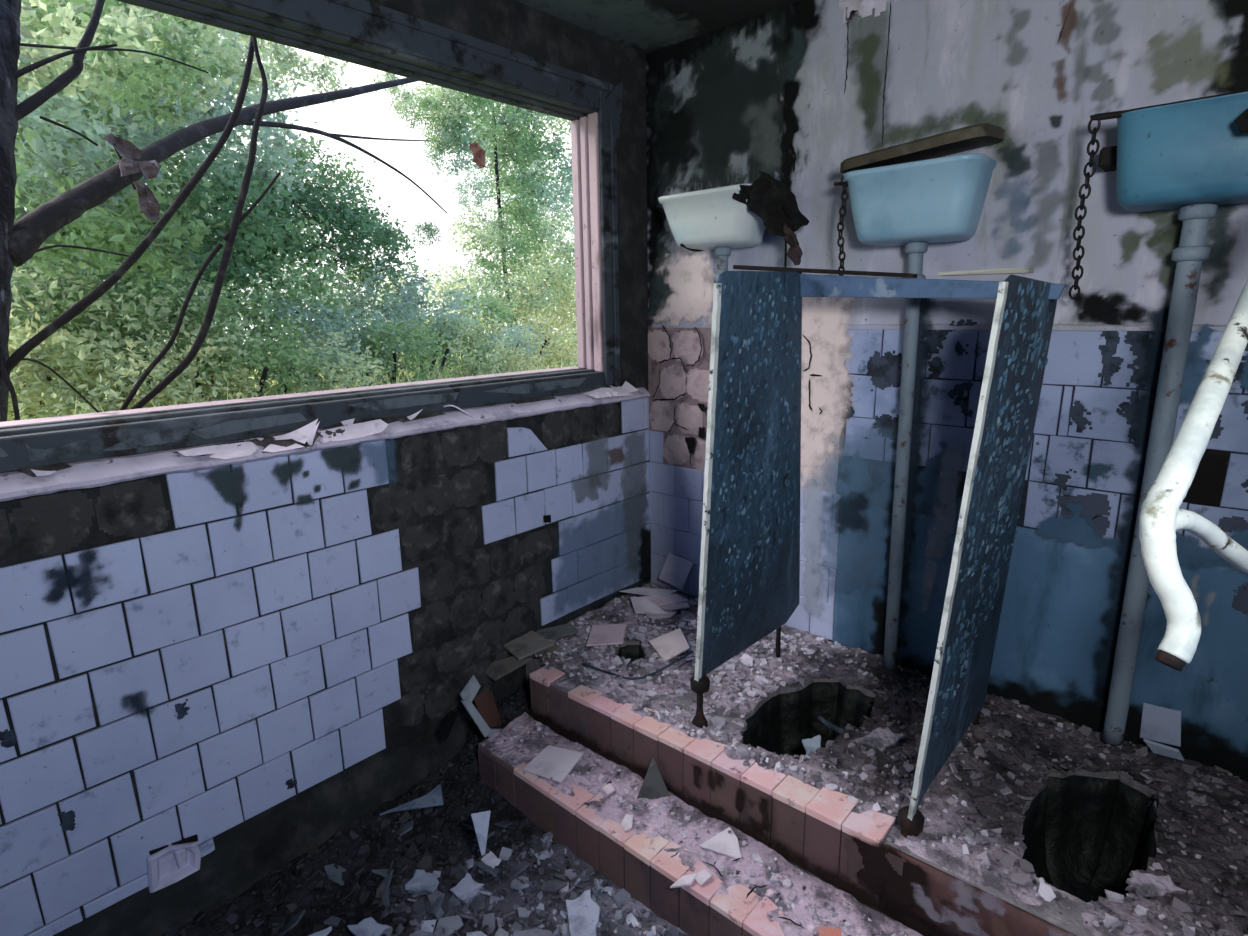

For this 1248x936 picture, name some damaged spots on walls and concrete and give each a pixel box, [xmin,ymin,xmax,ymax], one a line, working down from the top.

peeling [516,0,699,50]
water stain [1150,0,1248,94]
water stain [859,35,1030,176]
water stain [646,0,820,326]
water stain [1122,209,1183,309]
peeling [866,350,902,391]
peeling [483,250,855,698]
water stain [871,298,932,656]
water stain [45,549,107,607]
spalling [0,392,552,728]
peeling [0,729,17,748]
spalling [845,836,1003,935]